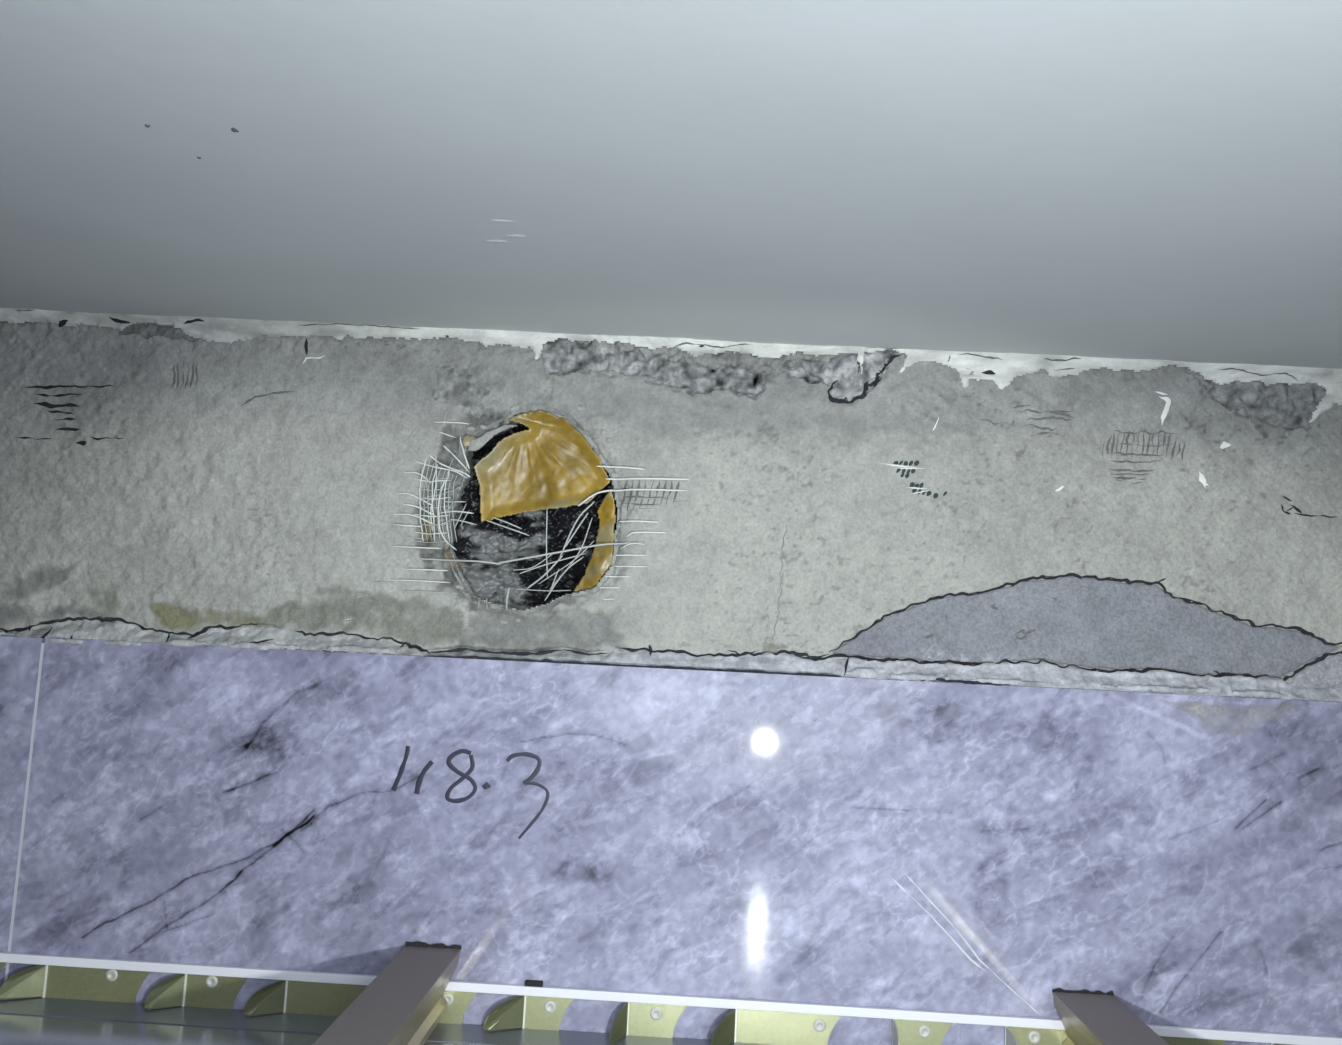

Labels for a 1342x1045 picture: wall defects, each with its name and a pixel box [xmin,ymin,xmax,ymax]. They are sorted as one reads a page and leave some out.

flaking render [541,338,893,402]
flaking render [1185,367,1327,430]
spalling [418,365,638,624]
crack [0,616,429,653]
flaking render [834,576,1342,698]